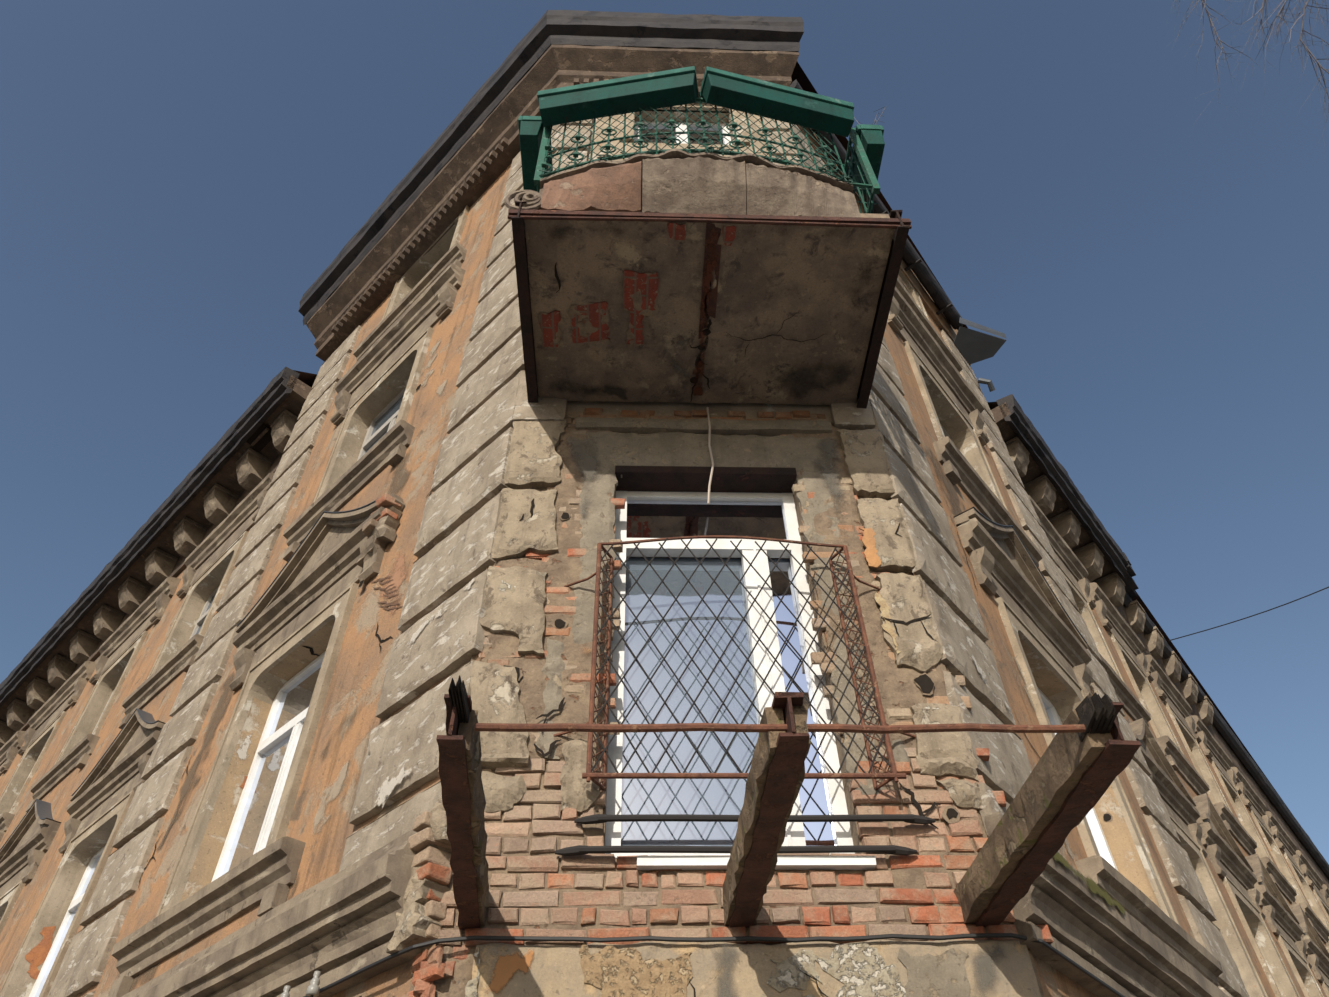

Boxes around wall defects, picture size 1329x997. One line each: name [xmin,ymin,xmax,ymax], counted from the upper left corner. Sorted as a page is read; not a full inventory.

crack [690,280,822,401]
crack [534,697,565,757]
spalling [386,408,1019,997]
peeling [374,766,412,807]
spalling [25,926,56,980]
spalling [1037,924,1054,944]
crack [798,968,828,997]